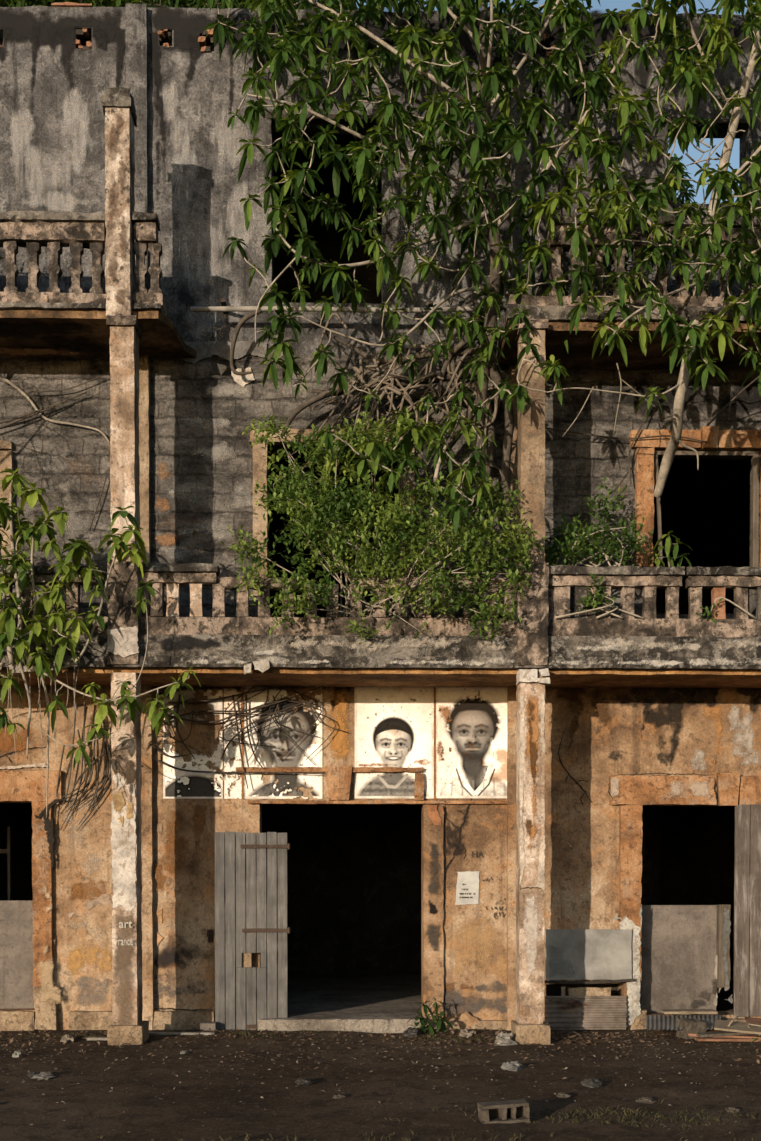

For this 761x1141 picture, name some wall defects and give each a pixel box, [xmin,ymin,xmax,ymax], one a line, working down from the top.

damp [0,8,126,113]
peeling [163,84,195,200]
spalling [179,186,267,387]
peeling [536,668,550,753]
crack [558,732,740,805]
damp [616,688,719,763]
damp [736,688,761,712]
peeling [65,773,137,918]
peeling [519,696,545,973]